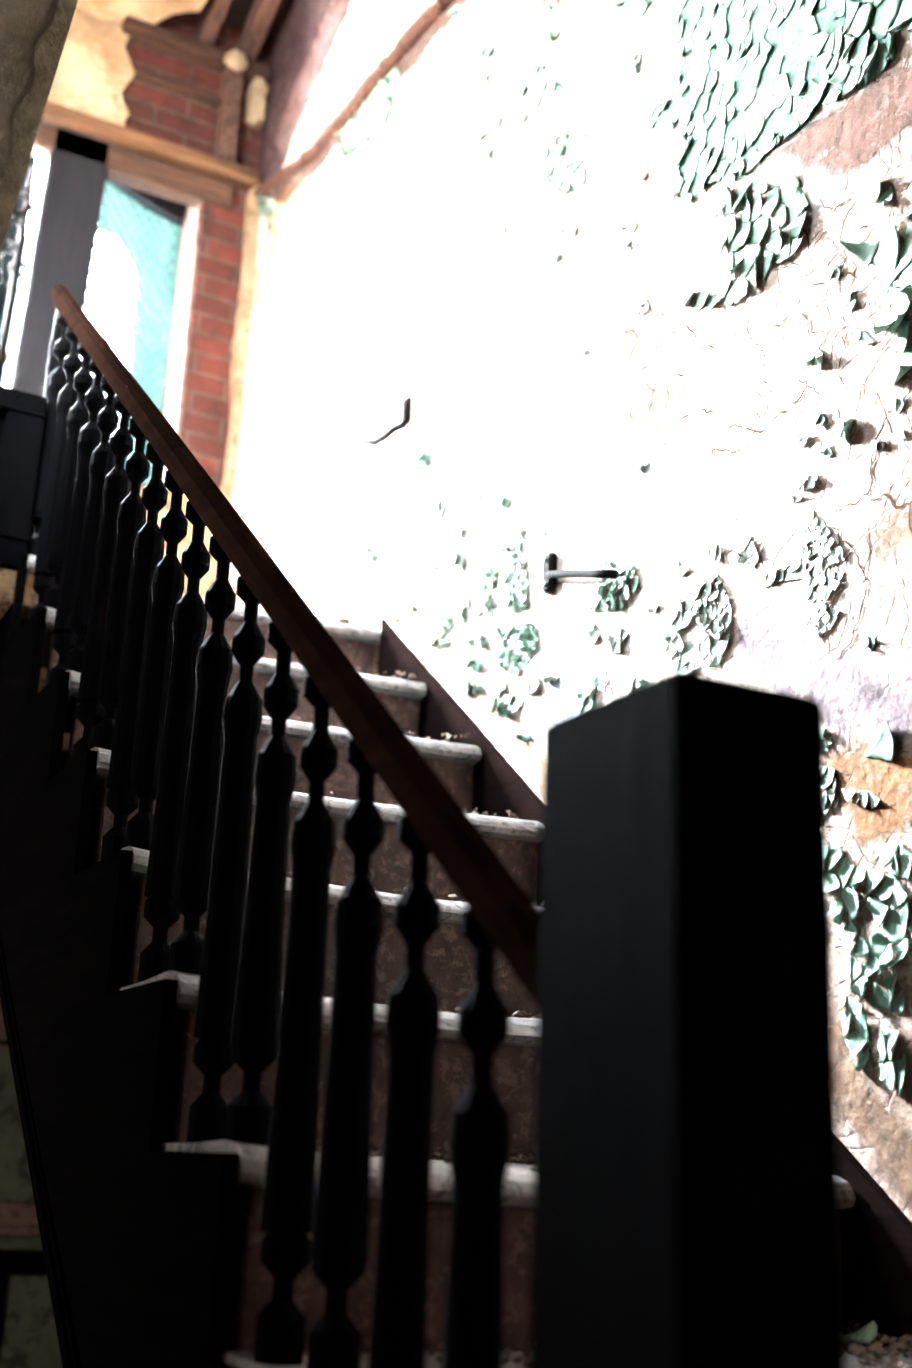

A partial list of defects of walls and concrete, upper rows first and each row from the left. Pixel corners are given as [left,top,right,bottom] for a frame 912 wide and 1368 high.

spalling [256,0,467,243]
peeling [515,0,568,124]
peeling [648,0,912,457]
peeling [387,462,845,794]
peeling [824,728,880,813]
peeling [861,635,876,651]
crack [832,438,912,659]
peeling [865,717,894,761]
peeling [828,841,912,1210]